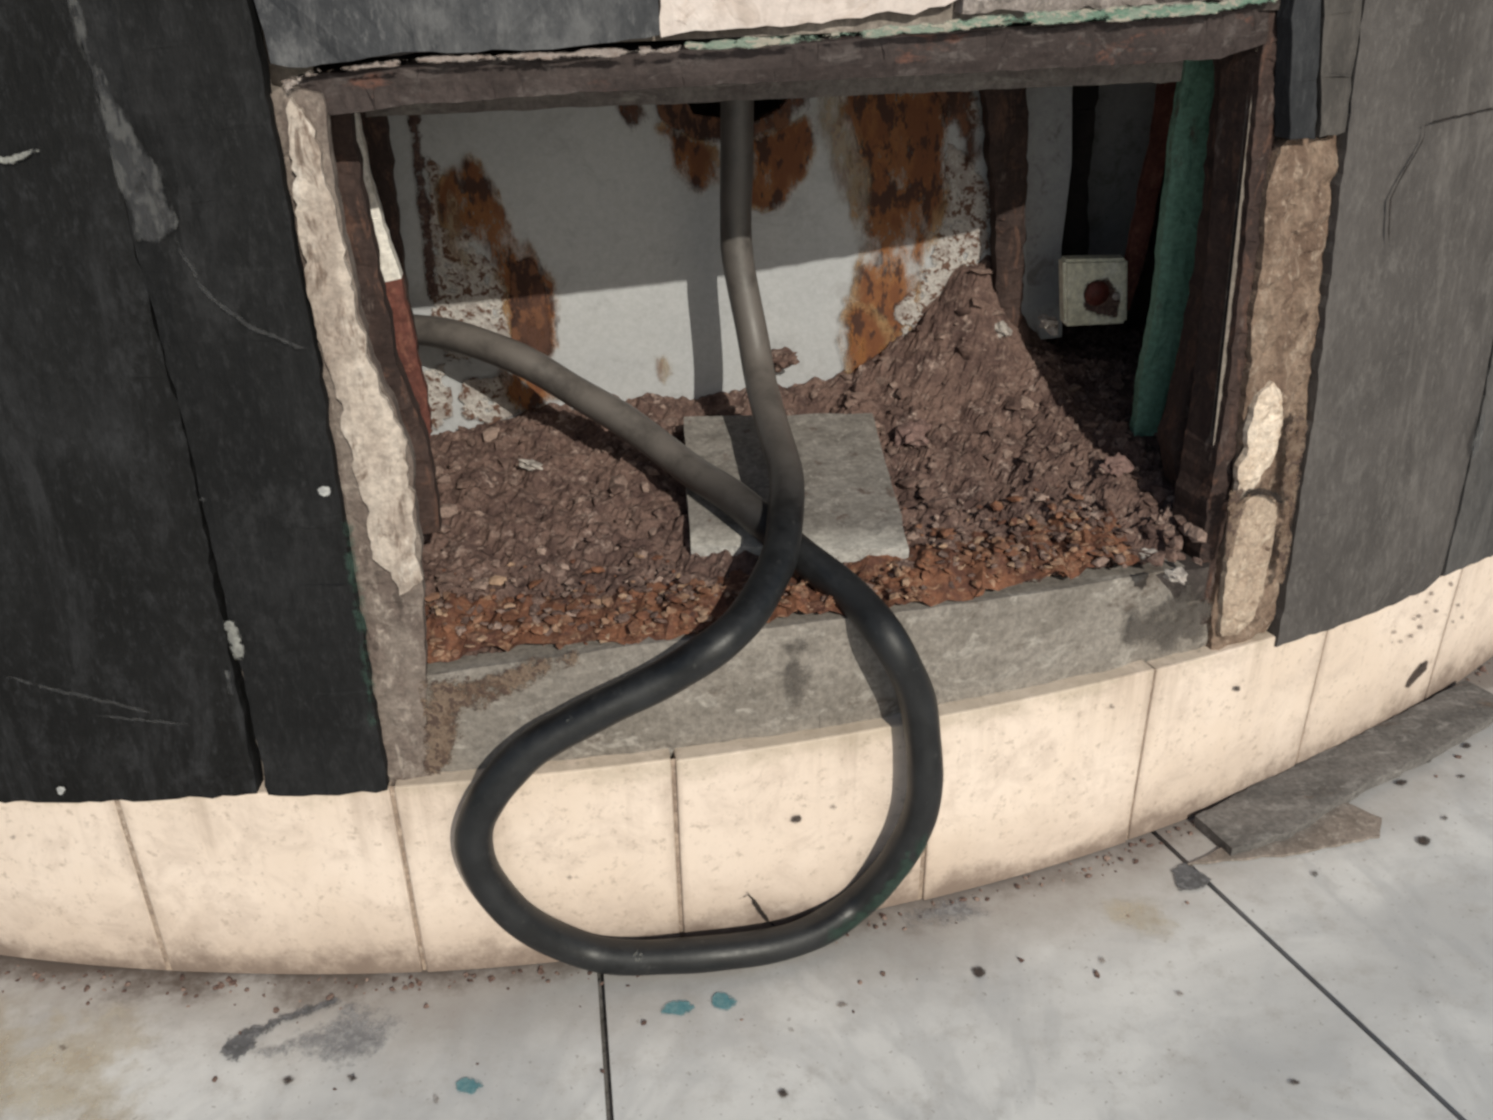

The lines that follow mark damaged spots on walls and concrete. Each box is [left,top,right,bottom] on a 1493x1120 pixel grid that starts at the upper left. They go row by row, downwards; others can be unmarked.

peeling [424,159,512,338]
corrosion [408,115,558,357]
corrosion [618,103,721,192]
corrosion [752,91,981,373]
peeling [894,144,991,335]
crack [1388,107,1493,243]
peeling [286,97,424,596]
peeling [423,350,519,433]
corrosion [499,371,551,412]
spalling [1206,135,1339,650]